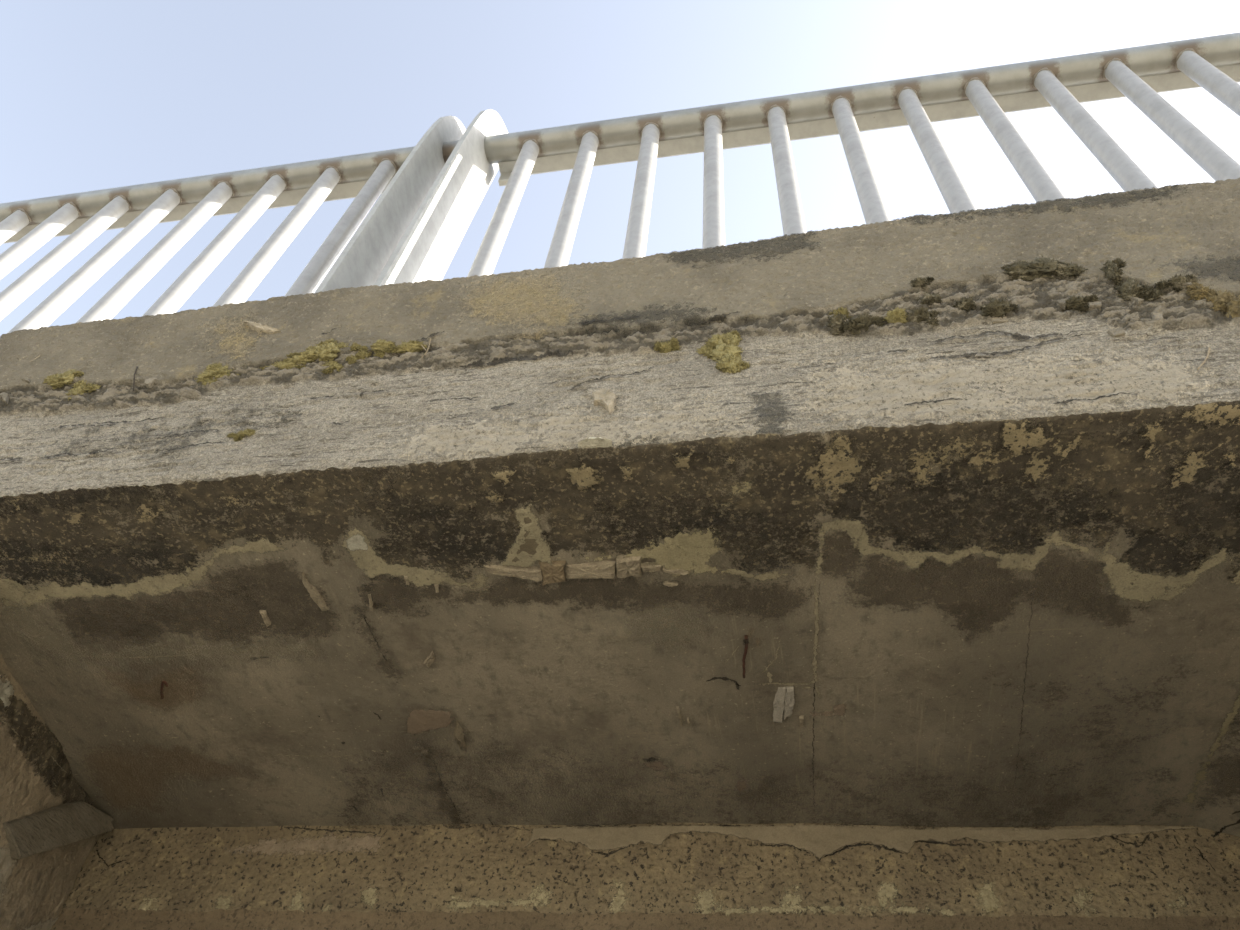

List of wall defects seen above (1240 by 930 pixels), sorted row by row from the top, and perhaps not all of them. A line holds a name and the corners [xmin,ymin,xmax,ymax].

spalling [1087,301,1102,311]
damp [0,391,1240,678]
damp [0,695,94,806]
crack [284,806,372,833]
crack [429,749,636,855]
crack [674,824,982,861]
crack [1110,811,1240,874]